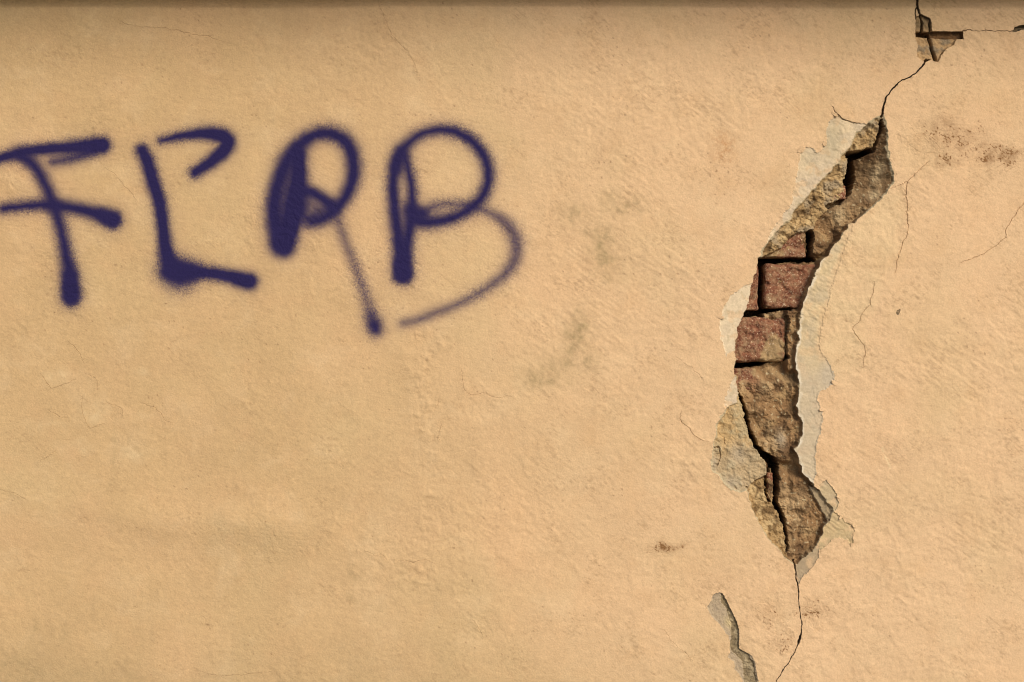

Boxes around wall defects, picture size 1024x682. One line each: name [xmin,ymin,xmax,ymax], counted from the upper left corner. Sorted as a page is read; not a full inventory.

crack [914,0,932,25]
spalling [915,16,964,63]
crack [881,62,926,114]
spalling [711,111,895,585]
spalling [707,592,758,682]
crack [776,581,803,682]